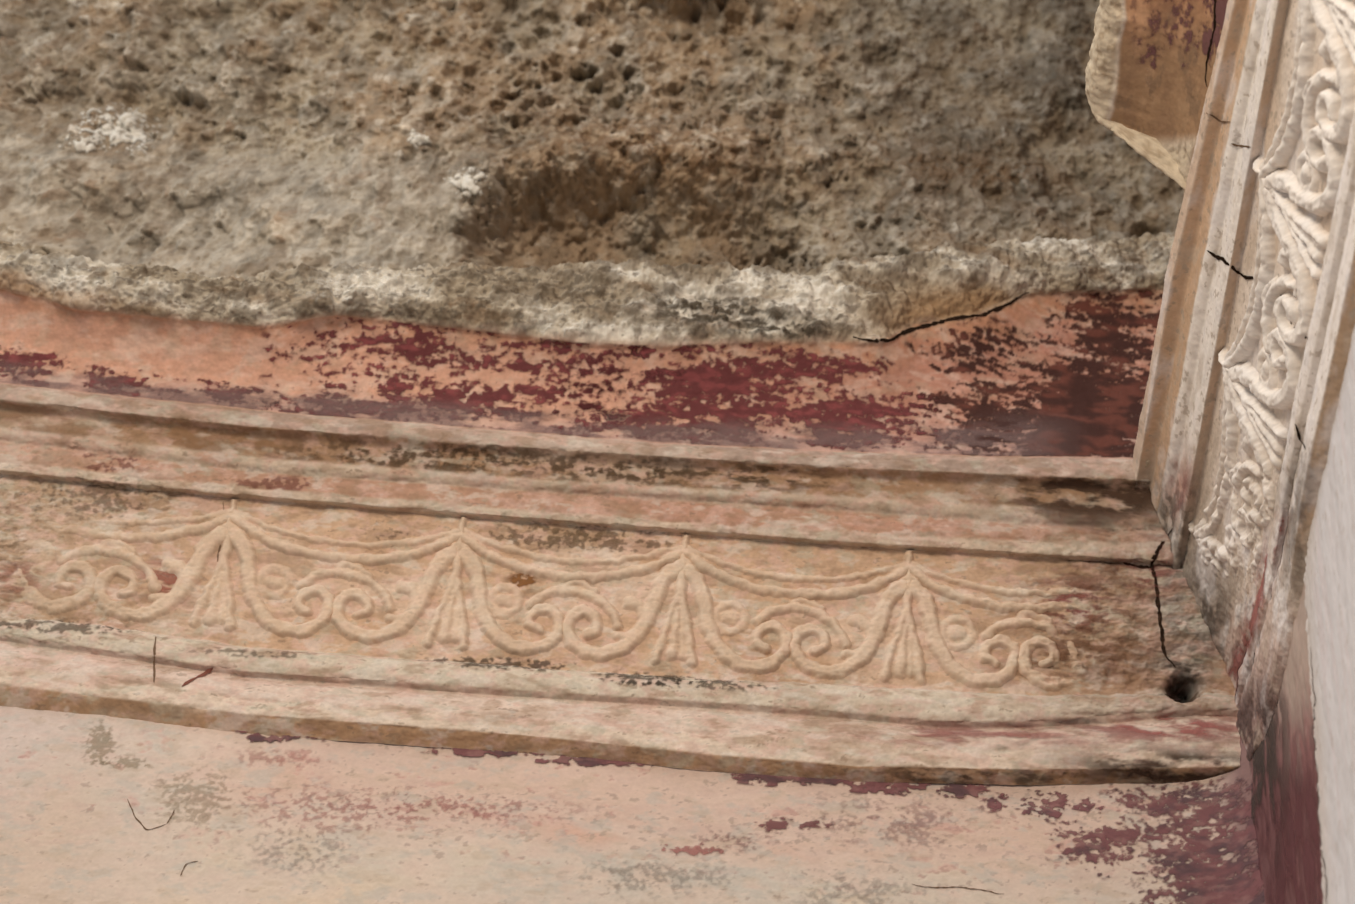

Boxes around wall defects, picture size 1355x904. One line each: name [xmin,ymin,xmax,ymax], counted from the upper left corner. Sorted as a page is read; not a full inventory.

peeling [1138,0,1228,69]
crack [1205,0,1250,148]
flaking render [0,0,1186,468]
crack [853,292,1029,343]
crack [1123,528,1175,667]
peeling [235,730,324,743]
peeling [426,747,652,767]
peeling [731,773,1266,904]